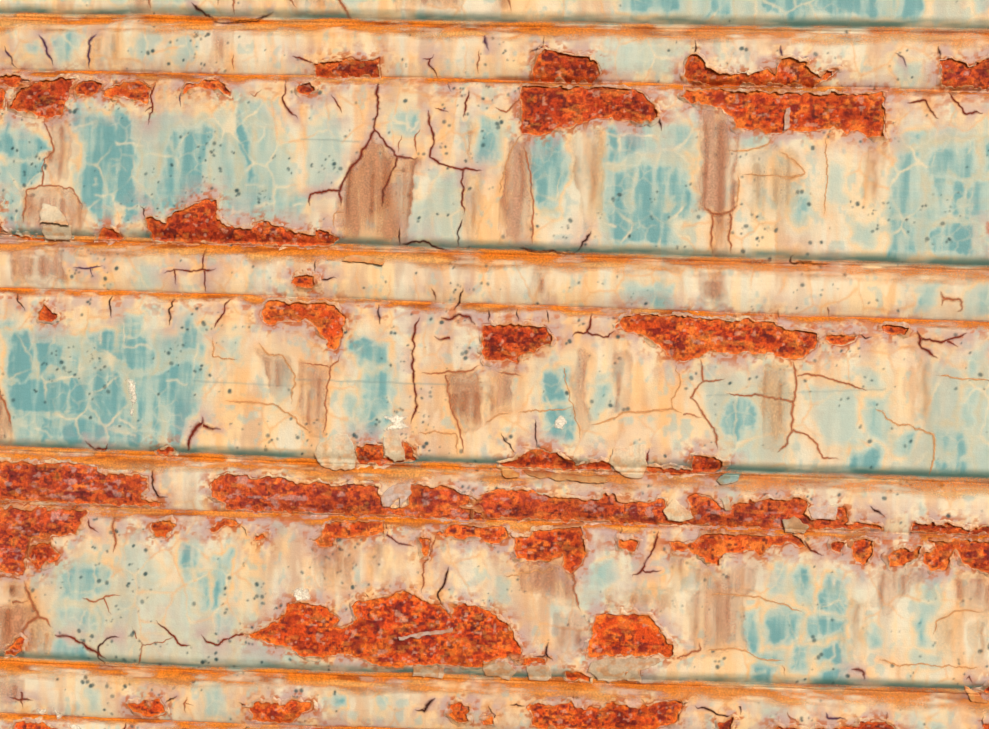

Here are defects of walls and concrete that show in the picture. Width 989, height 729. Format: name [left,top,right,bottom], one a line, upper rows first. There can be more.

corrosion [30,70,395,84]
crack [308,57,479,250]
corrosion [0,142,829,276]
crack [500,137,591,255]
corrosion [52,289,265,304]
corrosion [460,303,760,318]
corrosion [786,316,989,329]
crack [490,362,865,459]
crack [878,410,935,471]
peeling [205,433,989,577]
corrosion [0,657,989,710]
corrosion [0,712,279,729]